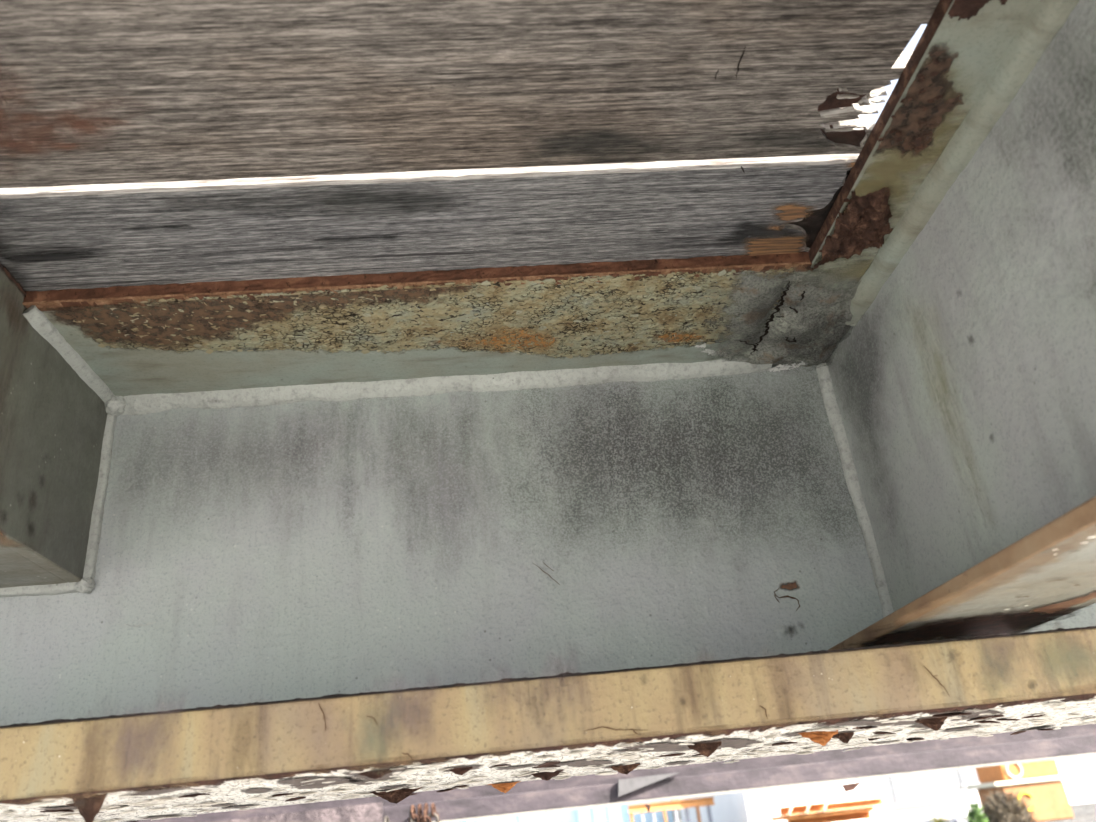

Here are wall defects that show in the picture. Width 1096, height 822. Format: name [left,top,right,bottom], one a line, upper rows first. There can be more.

rust [947,0,1007,20]
rust [0,46,964,351]
rust [0,524,1096,728]
peeling [0,801,81,822]
rust [0,684,1096,805]
peeling [93,698,1096,822]